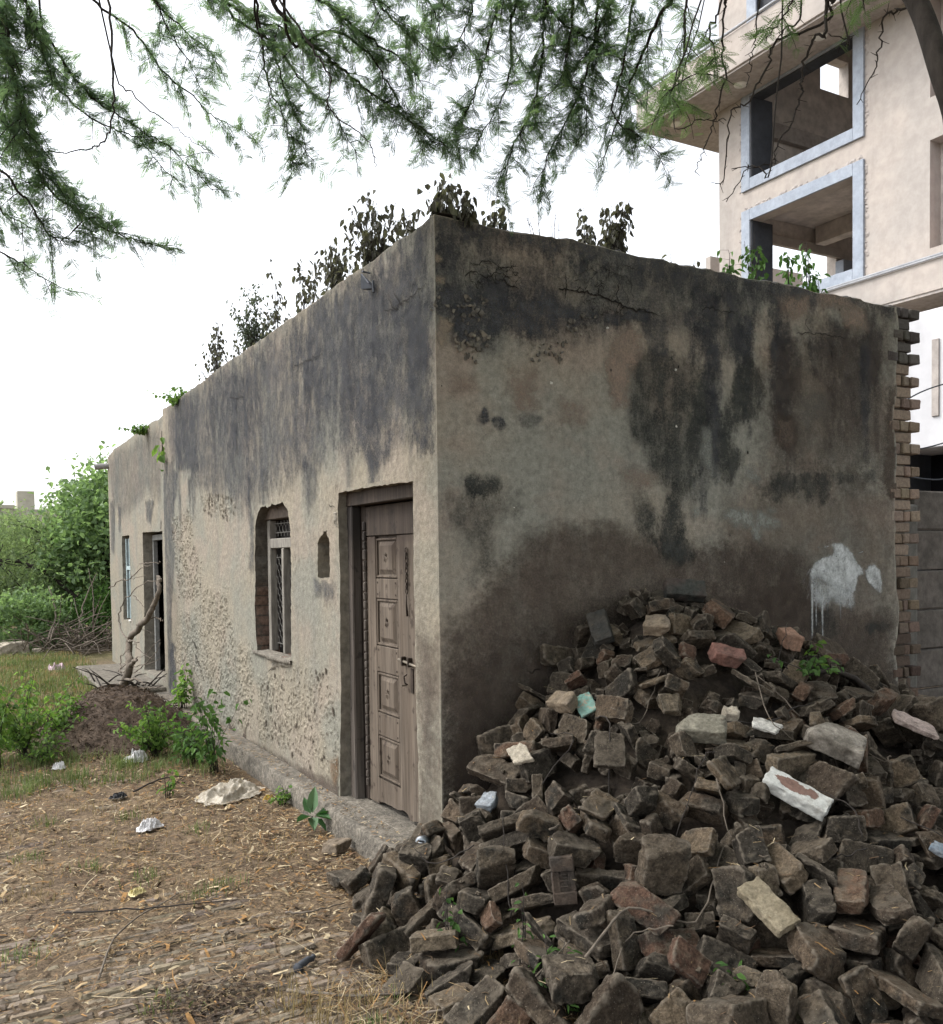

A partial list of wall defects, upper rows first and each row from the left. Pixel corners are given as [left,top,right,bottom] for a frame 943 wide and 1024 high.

peeling [430,276,491,364]
crack [462,259,521,289]
crack [558,261,662,318]
damp [146,216,897,805]